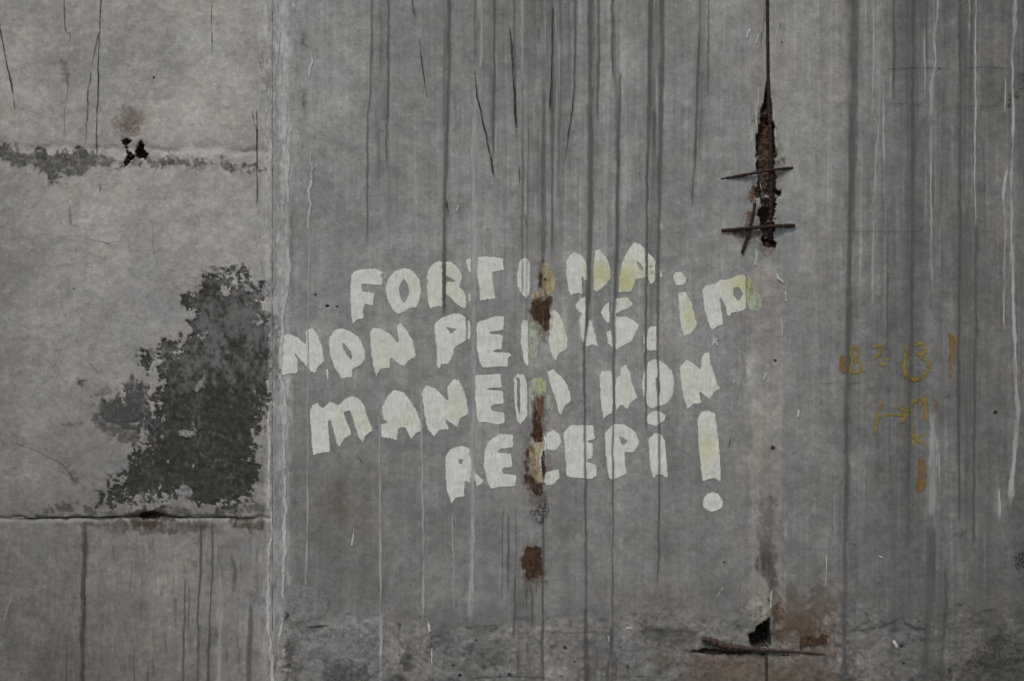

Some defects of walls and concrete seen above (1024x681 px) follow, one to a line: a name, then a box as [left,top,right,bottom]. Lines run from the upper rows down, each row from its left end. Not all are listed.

spalling [122,138,148,167]
crack [475,73,494,174]
crack [509,27,517,124]
rust [721,0,795,253]
spalling [751,88,780,199]
rust [530,259,553,331]
leakage [570,0,621,548]
leakage [644,0,673,576]
leakage [998,0,1024,517]
rust [524,396,546,496]
crack [21,512,241,520]
spalling [749,618,771,648]